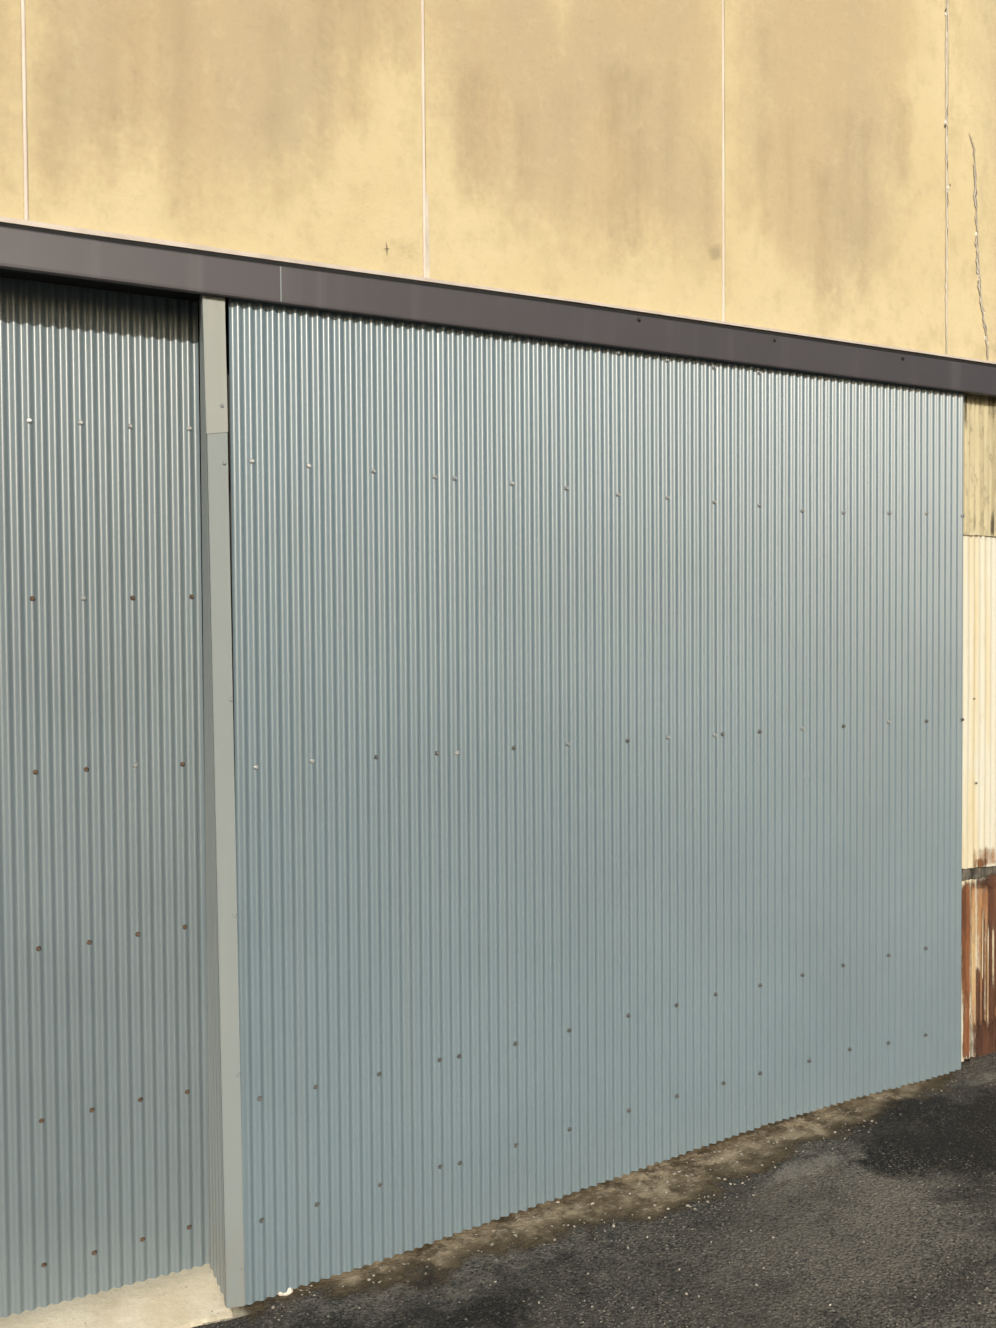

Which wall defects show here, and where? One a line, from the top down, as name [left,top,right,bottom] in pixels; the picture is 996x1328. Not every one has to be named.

crack [944,0,989,360]
rust [961,849,996,1059]